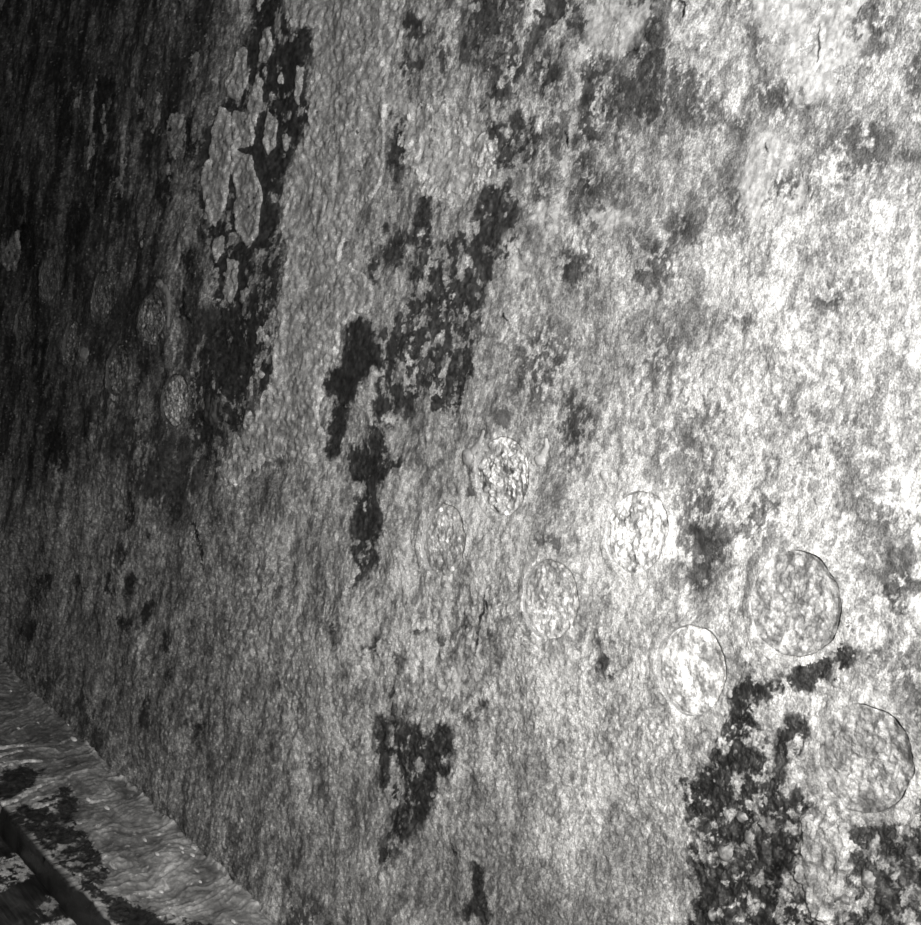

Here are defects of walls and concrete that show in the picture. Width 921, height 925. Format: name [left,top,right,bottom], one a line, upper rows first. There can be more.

damp [321,0,666,597]
damp [685,525,730,593]
damp [878,545,921,615]
damp [453,586,496,721]
damp [595,637,614,681]
damp [372,686,456,870]
damp [676,643,889,925]
damp [831,804,921,925]